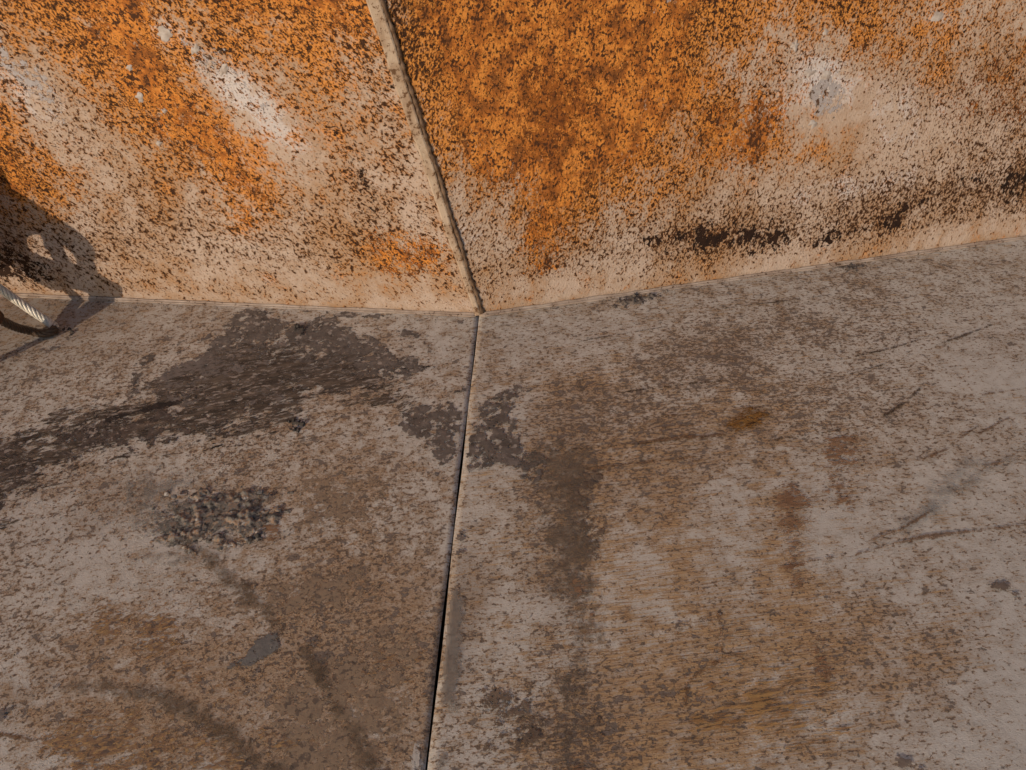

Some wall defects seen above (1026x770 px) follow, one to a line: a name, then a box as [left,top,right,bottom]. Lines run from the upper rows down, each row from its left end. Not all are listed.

rust [0,237,69,288]
rust [71,0,279,238]
rust [216,0,374,68]
rust [332,126,376,212]
rust [359,226,453,287]
rust [390,0,800,278]
rust [812,191,940,264]
rust [943,20,1026,132]
rust [950,165,1026,204]
damp [127,474,269,564]
rust [764,432,866,595]
rust [654,615,852,765]